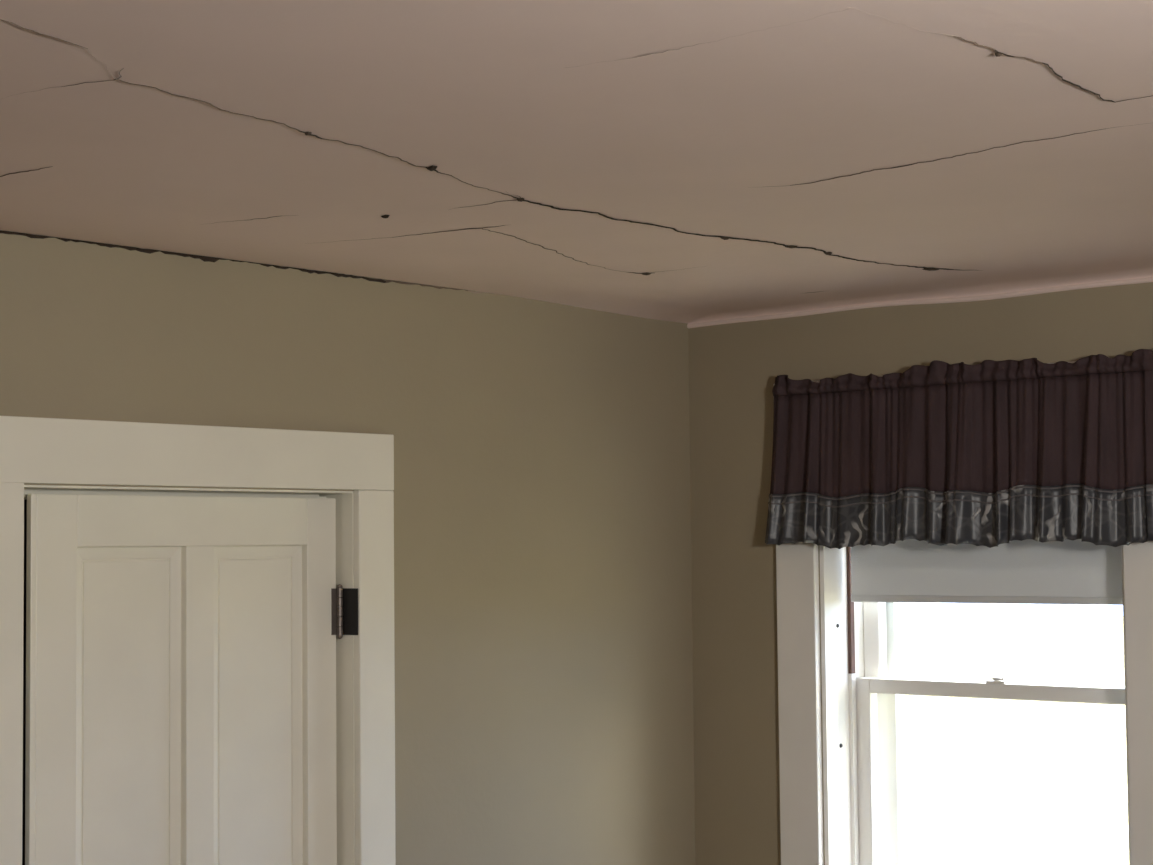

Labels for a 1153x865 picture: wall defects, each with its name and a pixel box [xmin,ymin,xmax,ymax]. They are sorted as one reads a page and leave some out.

crack [0,19,983,295]
crack [566,8,1153,188]